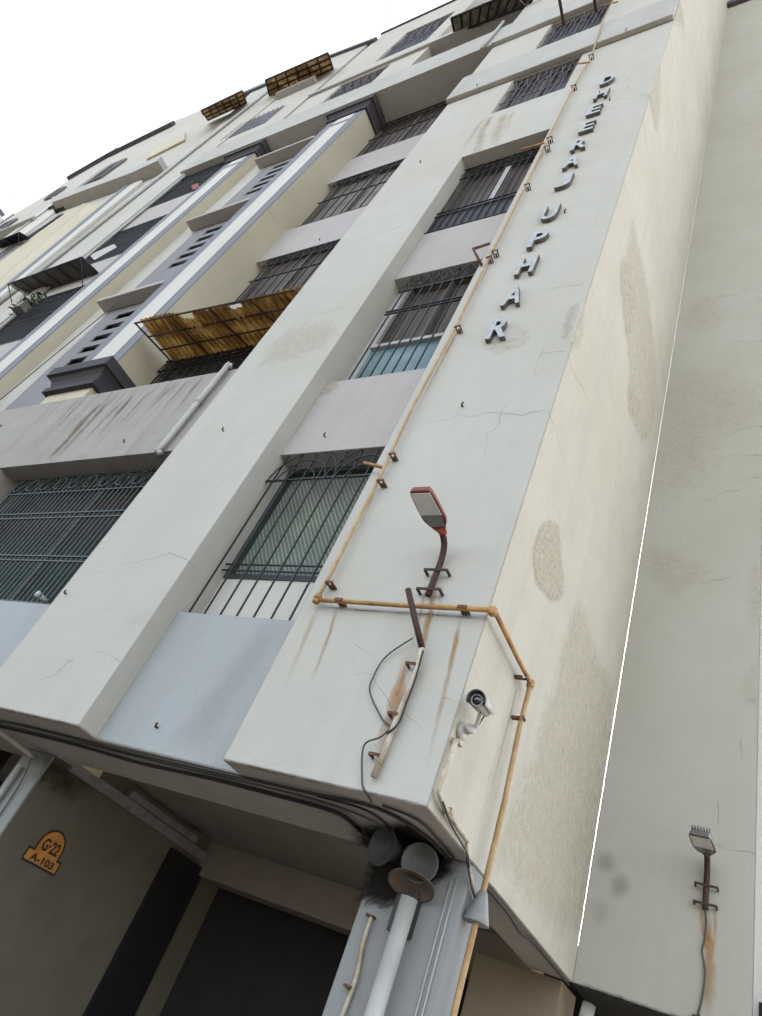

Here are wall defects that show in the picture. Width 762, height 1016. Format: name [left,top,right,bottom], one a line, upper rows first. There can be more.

corrosion [390,676,404,719]